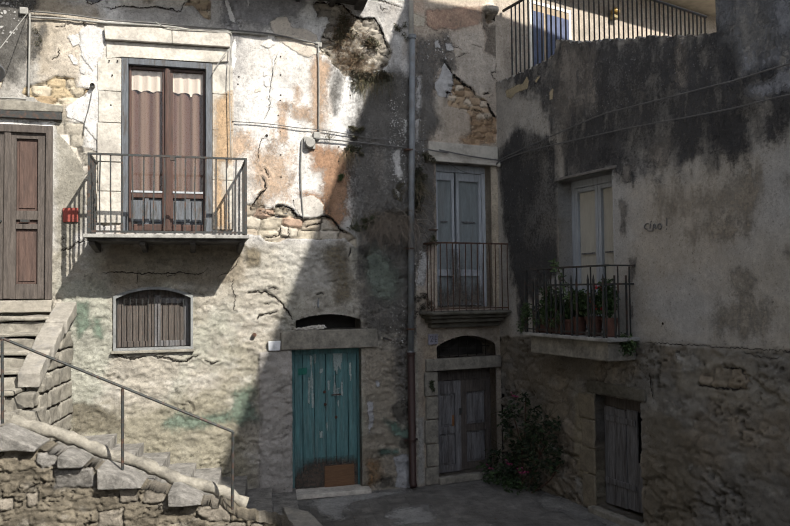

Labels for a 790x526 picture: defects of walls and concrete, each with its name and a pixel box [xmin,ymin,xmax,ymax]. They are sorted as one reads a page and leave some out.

crack [86,0,186,12]
spalling [185,0,211,20]
spalling [261,0,392,76]
peeling [22,25,121,226]
spalling [435,63,497,144]
damp [498,0,790,340]
crack [102,261,292,319]
damp [244,245,261,267]
spalling [247,192,357,247]
damp [324,33,460,424]